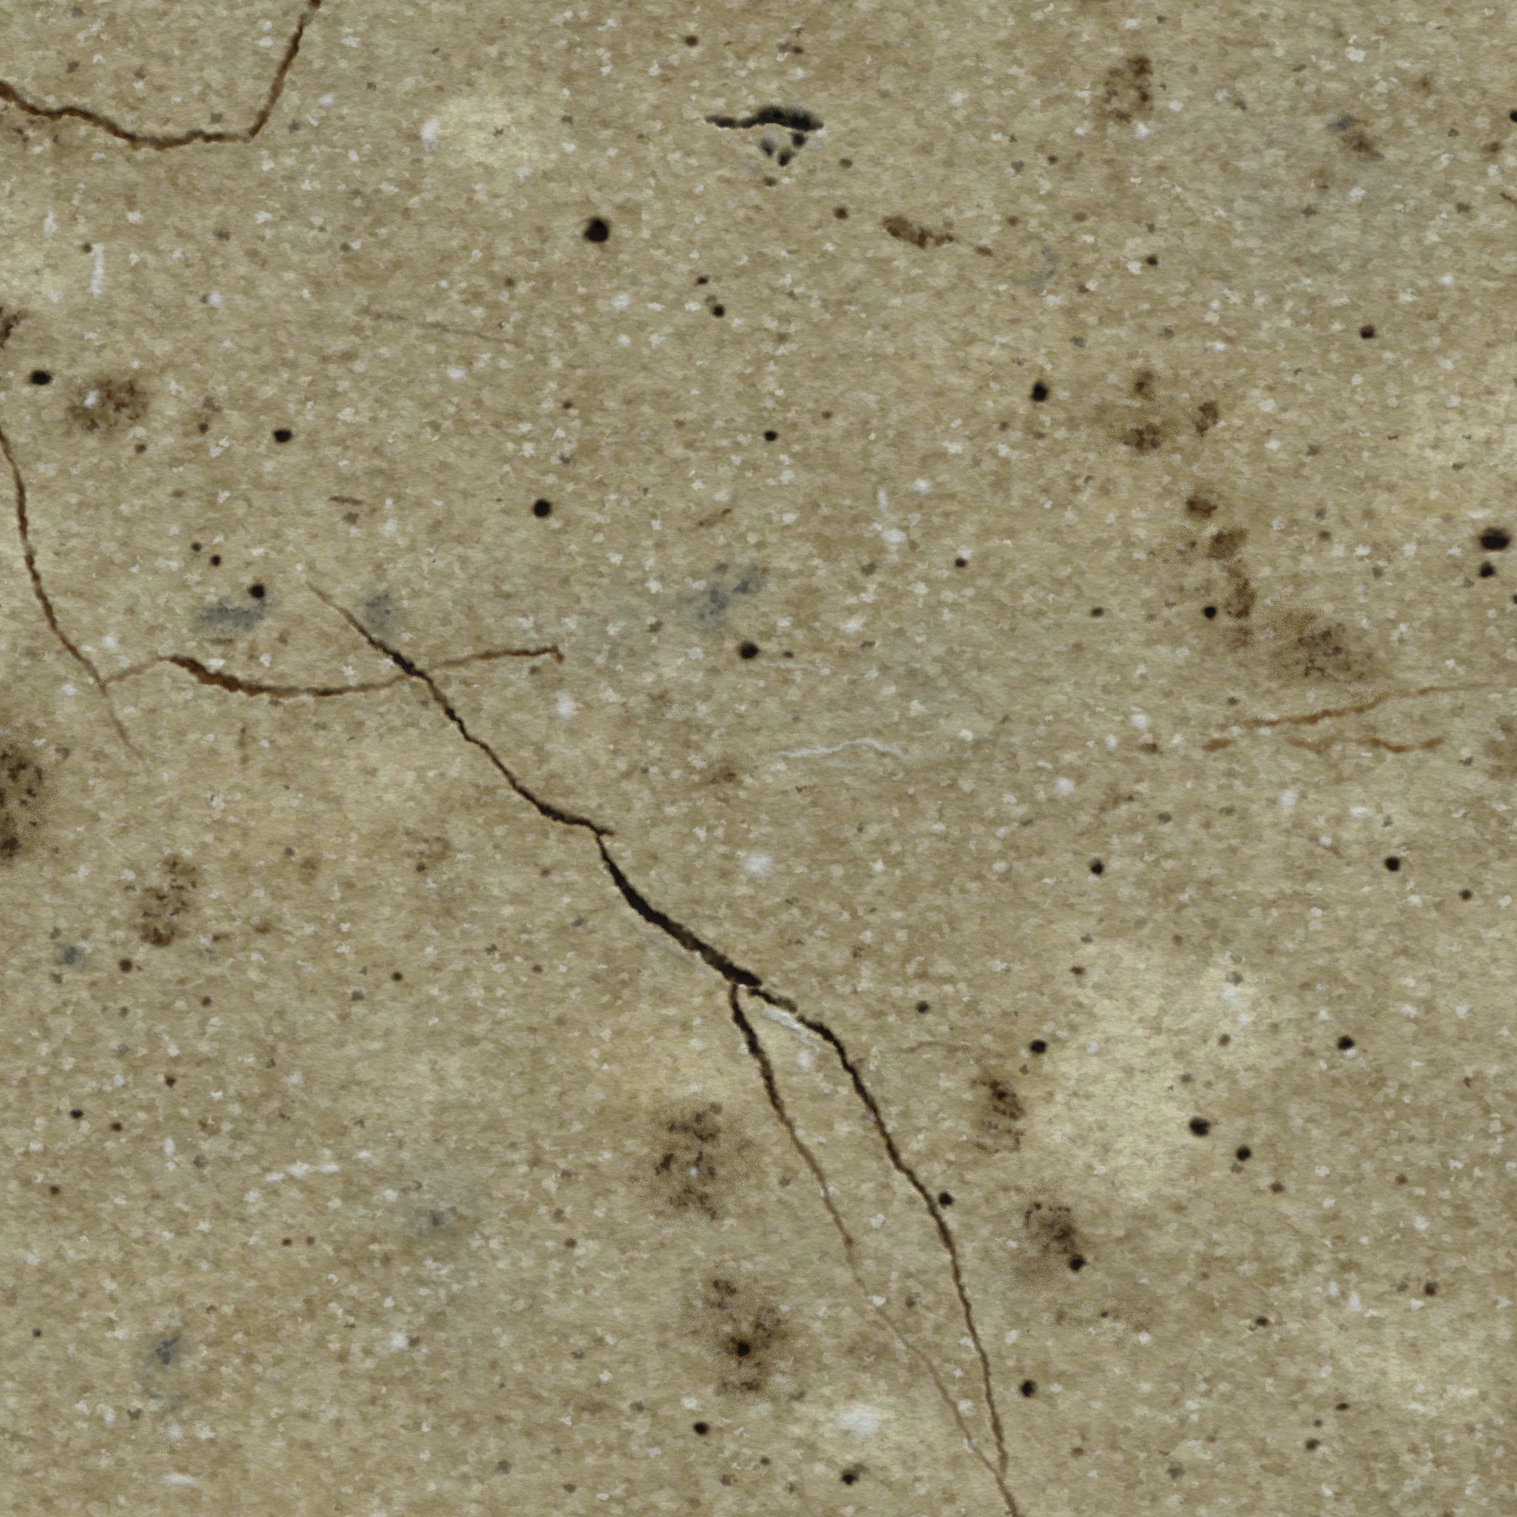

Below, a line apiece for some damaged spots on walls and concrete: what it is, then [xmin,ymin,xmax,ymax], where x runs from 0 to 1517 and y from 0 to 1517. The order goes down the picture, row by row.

crack [0,0,321,150]
crack [0,430,105,691]
crack [159,657,366,698]
leakage [0,746,42,866]
crack [349,619,1002,1445]
leakage [655,1113,717,1219]
leakage [713,1280,785,1392]